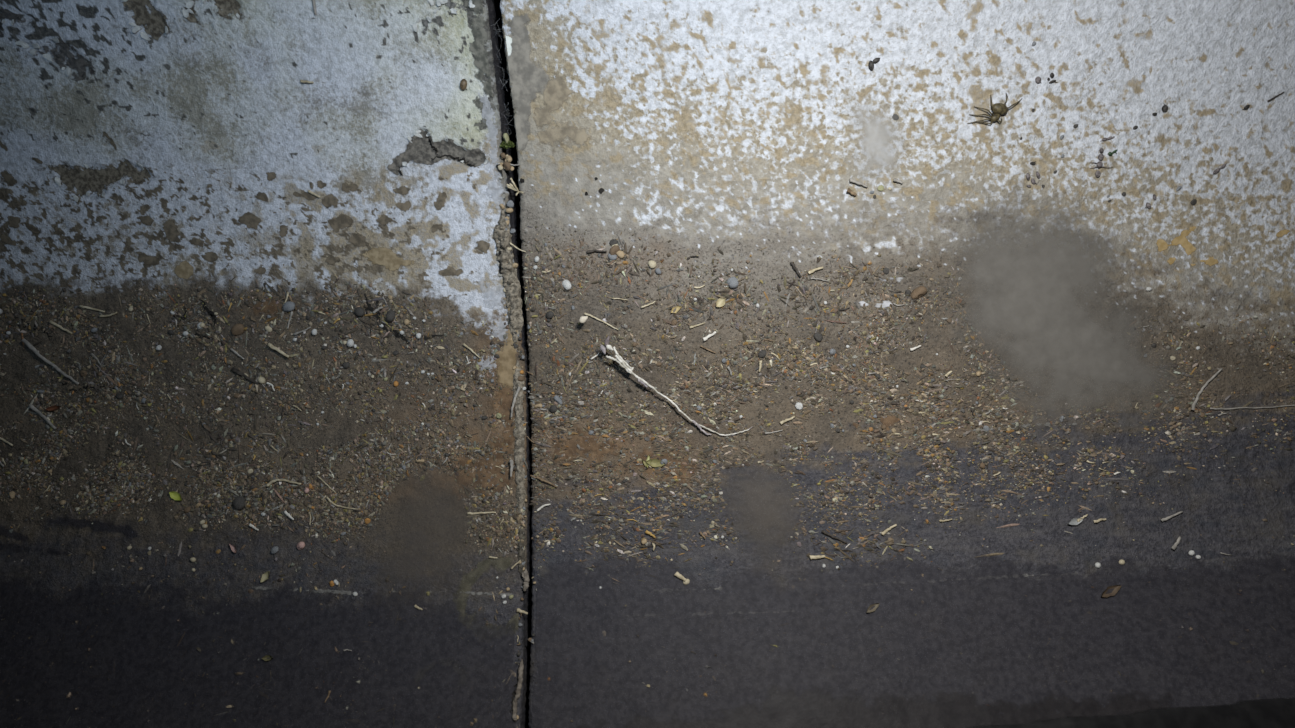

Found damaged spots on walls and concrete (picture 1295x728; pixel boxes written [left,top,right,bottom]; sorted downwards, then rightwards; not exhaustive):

peeling [122,0,171,41]
peeling [182,0,250,30]
peeling [412,0,475,35]
peeling [0,8,94,81]
peeling [48,158,151,202]
spalling [387,129,506,199]
leakage [438,266,463,276]
leakage [0,555,519,728]
leakage [532,554,1295,728]